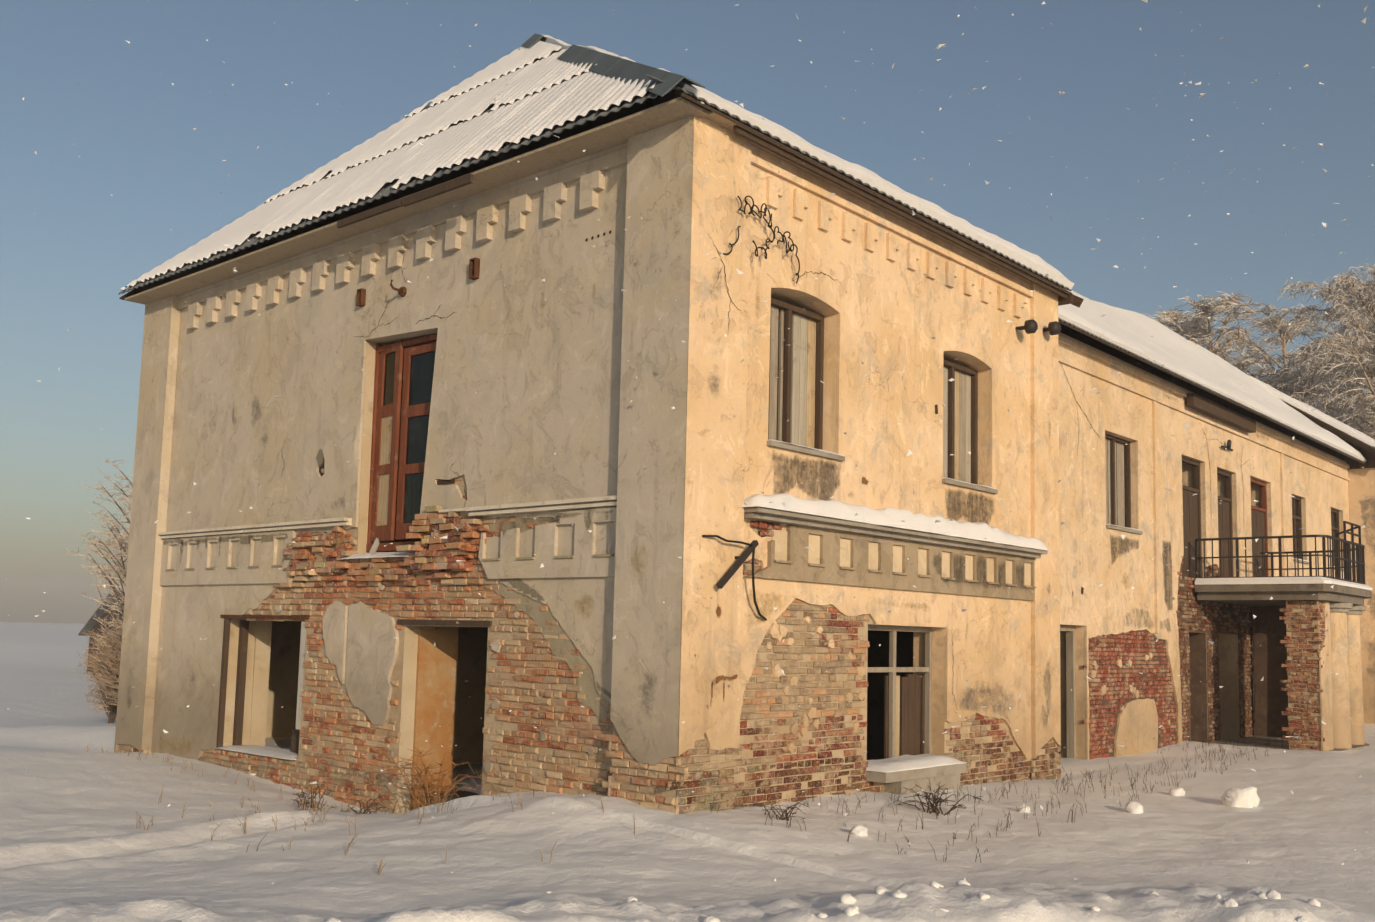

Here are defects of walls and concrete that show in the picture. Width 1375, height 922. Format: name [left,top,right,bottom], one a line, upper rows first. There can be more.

crack [355,253,456,338]
leakage [774,456,839,501]
leakage [947,491,992,524]
spalling [198,479,885,814]
spalling [1083,561,1255,759]
spalling [944,715,1061,786]